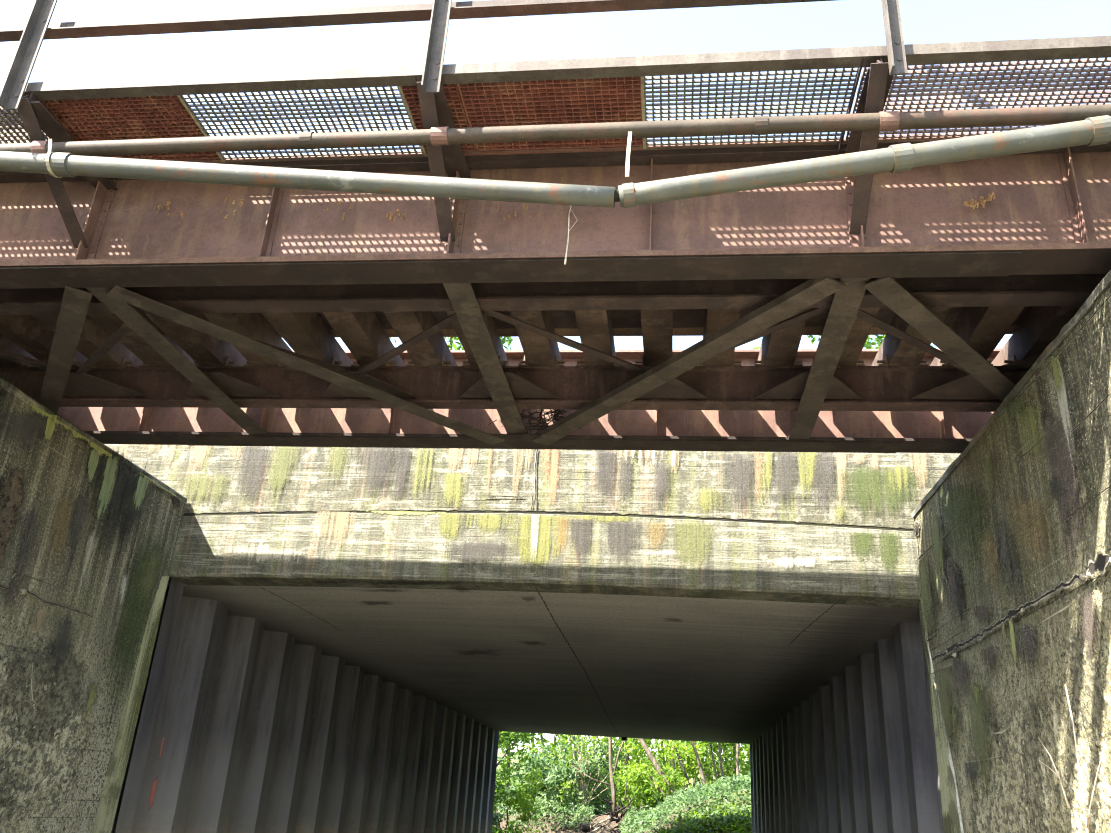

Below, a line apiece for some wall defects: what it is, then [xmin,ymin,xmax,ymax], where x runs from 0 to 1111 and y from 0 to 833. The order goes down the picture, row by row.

rust [964,191,995,210]
leakage [237,446,299,498]
leakage [327,447,434,497]
rust [447,448,493,486]
rust [513,449,559,501]
leakage [593,450,675,502]
leakage [1006,356,1086,562]
leakage [440,473,591,566]
crack [0,584,90,616]
leakage [71,448,164,723]
leakage [916,455,1024,792]
crack [926,551,1111,661]